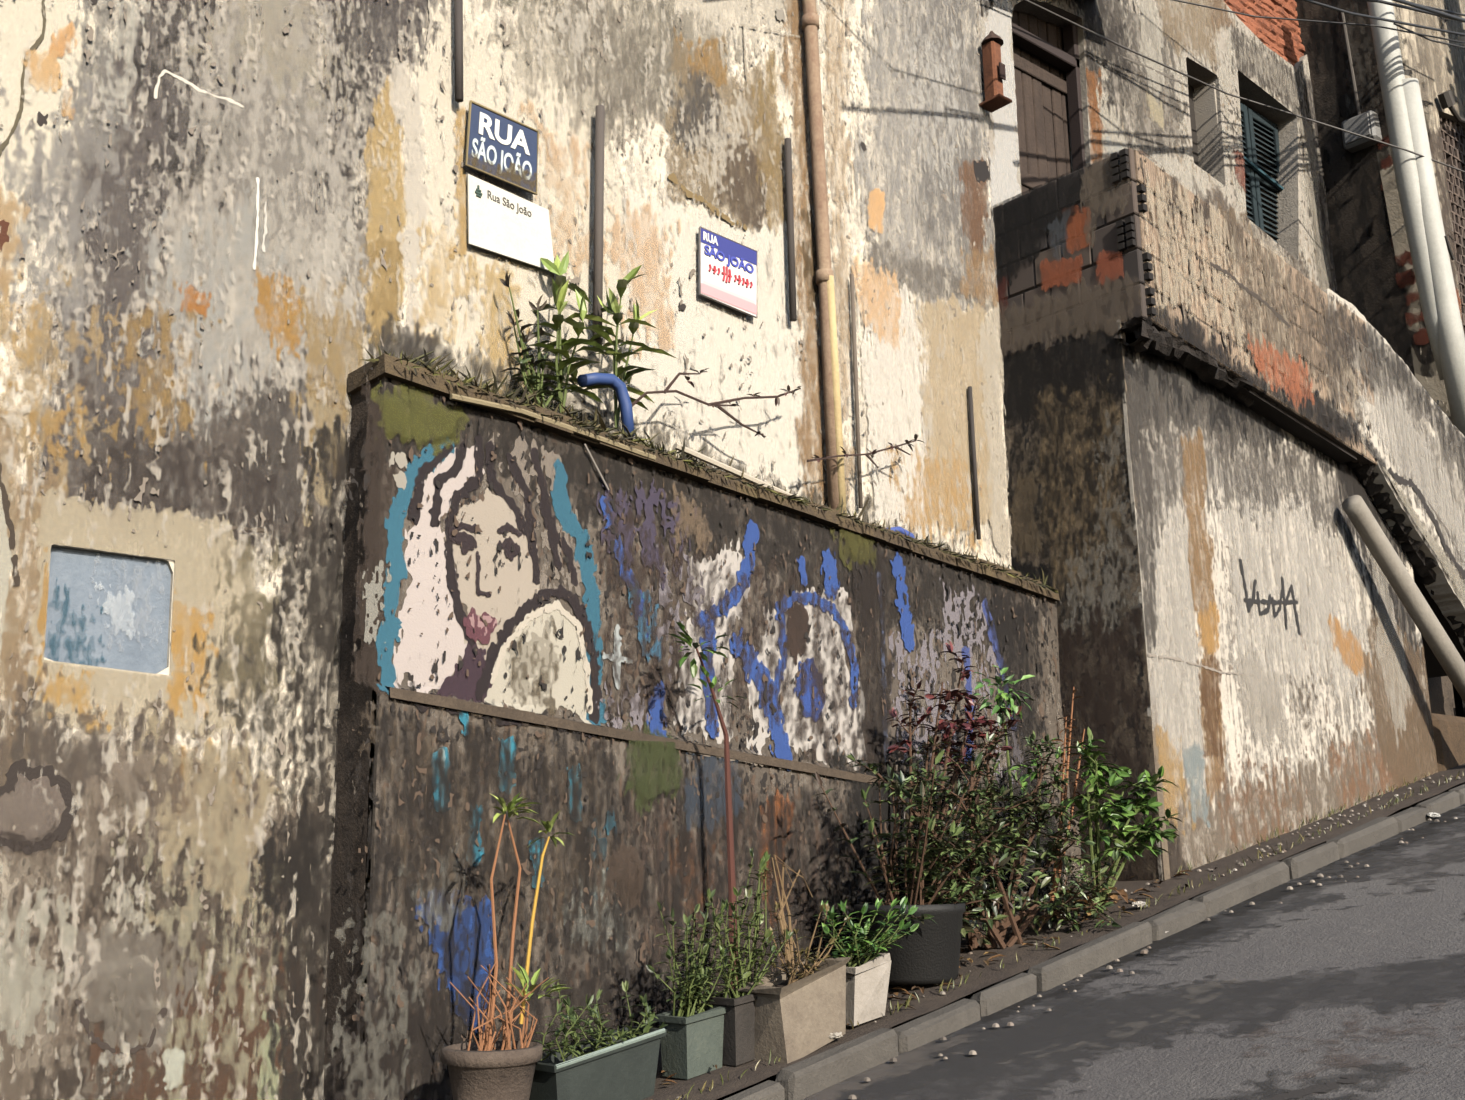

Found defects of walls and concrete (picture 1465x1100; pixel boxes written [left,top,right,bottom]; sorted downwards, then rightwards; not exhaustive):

crack [0,0,46,156]
flaking render [1223,0,1305,66]
crack [0,460,20,587]
leakage [0,0,828,1100]
leakage [338,0,1429,1100]